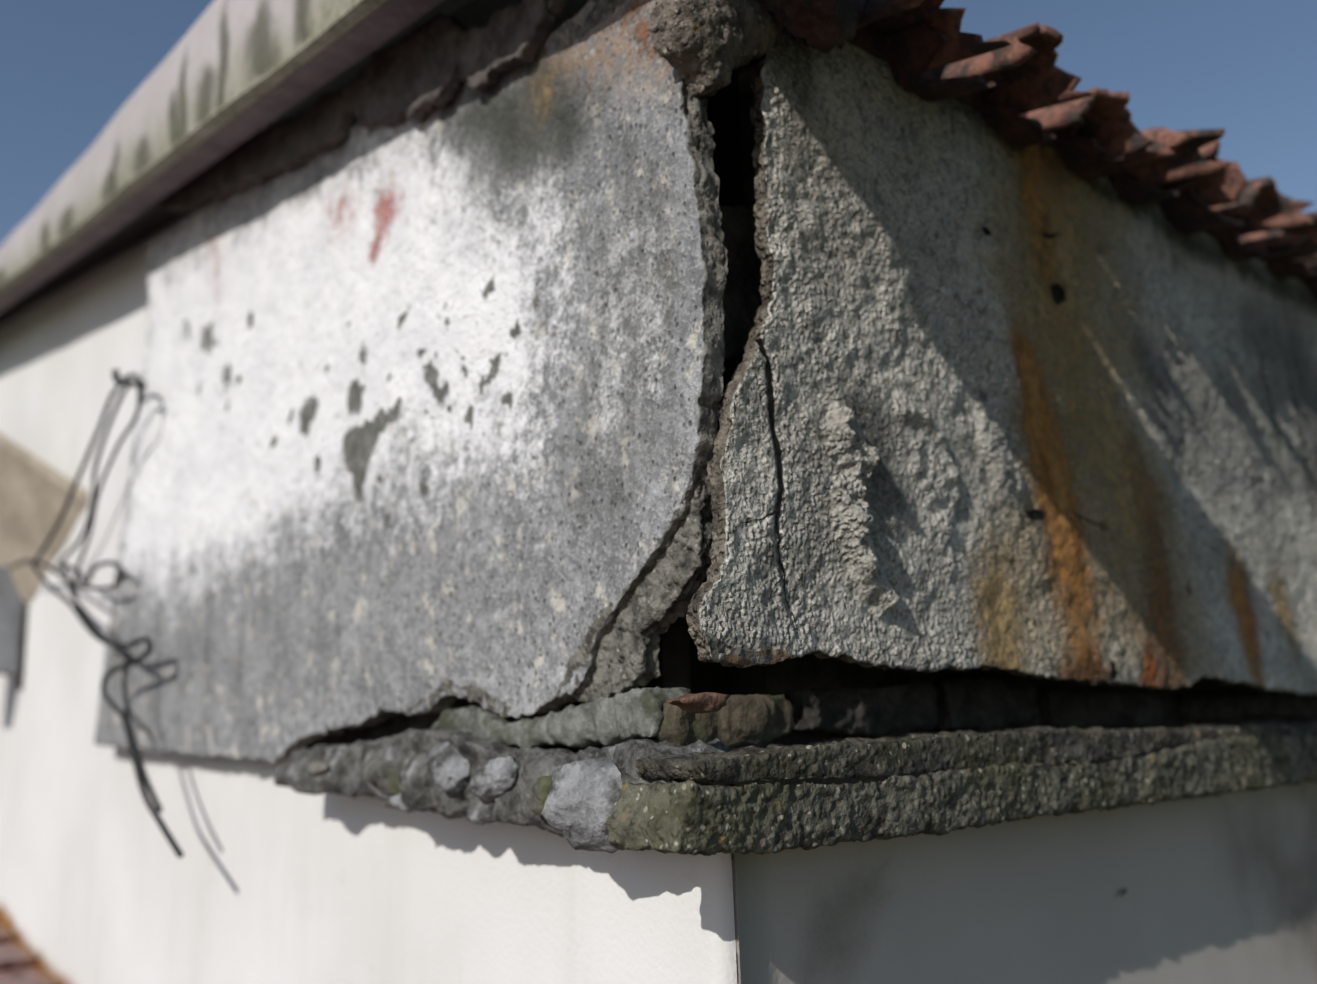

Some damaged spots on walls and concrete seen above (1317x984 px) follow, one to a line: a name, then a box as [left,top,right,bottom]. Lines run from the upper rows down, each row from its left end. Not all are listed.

damp [169,17,227,143]
damp [252,5,274,74]
damp [295,0,307,38]
crack [687,68,744,207]
peeling [288,396,320,436]
peeling [342,340,401,502]
peeling [417,349,501,430]
corrosion [1010,143,1187,688]
crack [718,338,799,636]
crack [689,634,767,695]
corrosion [972,554,1022,669]
corrosion [1225,549,1263,687]